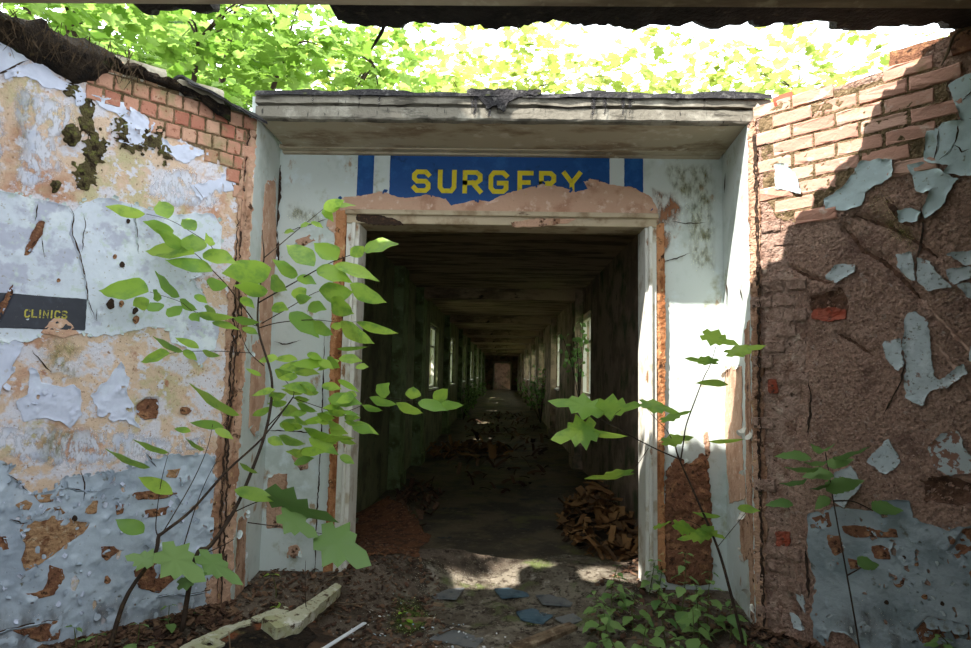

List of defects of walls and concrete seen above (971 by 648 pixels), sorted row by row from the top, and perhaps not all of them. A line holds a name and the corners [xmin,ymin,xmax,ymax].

crack [934,92,971,160]
damp [658,192,680,250]
crack [916,204,924,278]
peeling [0,42,278,648]
flaking render [721,55,971,648]
spalling [664,431,717,586]